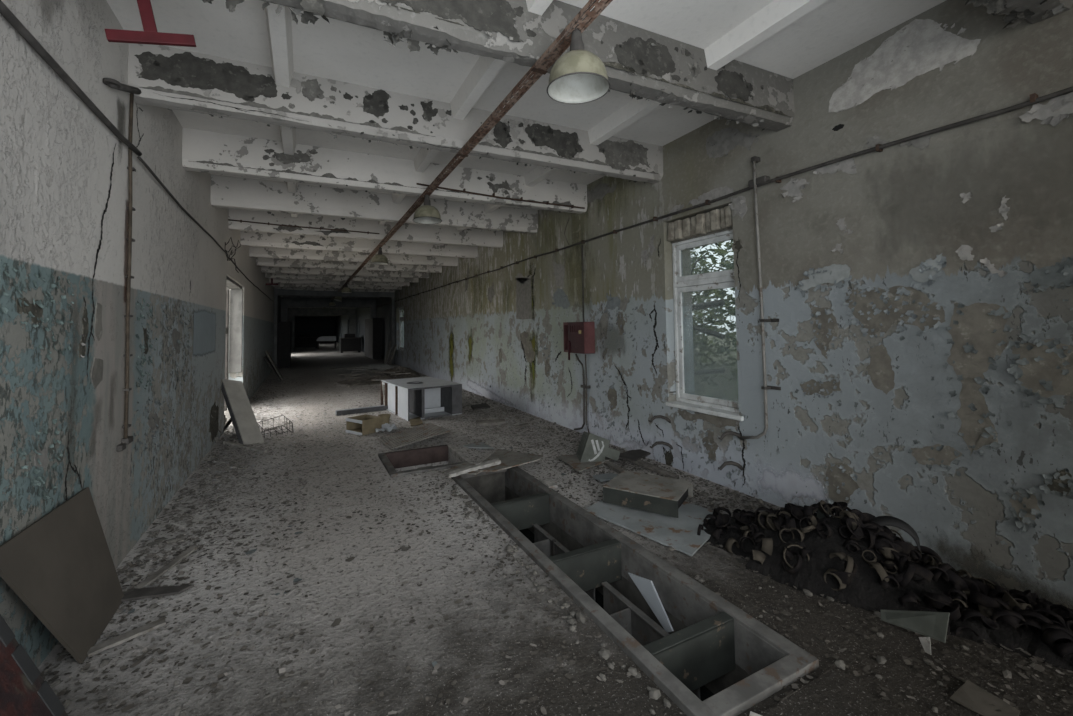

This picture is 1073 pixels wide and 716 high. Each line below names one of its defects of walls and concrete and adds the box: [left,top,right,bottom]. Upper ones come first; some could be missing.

peeling [601,37,790,130]
peeling [829,19,981,113]
peeling [1020,92,1073,127]
peeling [134,299,191,452]
spalling [209,403,221,442]
crack [614,365,684,469]
crack [649,303,659,374]
peeling [794,218,1012,476]
peeling [823,462,867,506]
peeling [1004,468,1073,534]